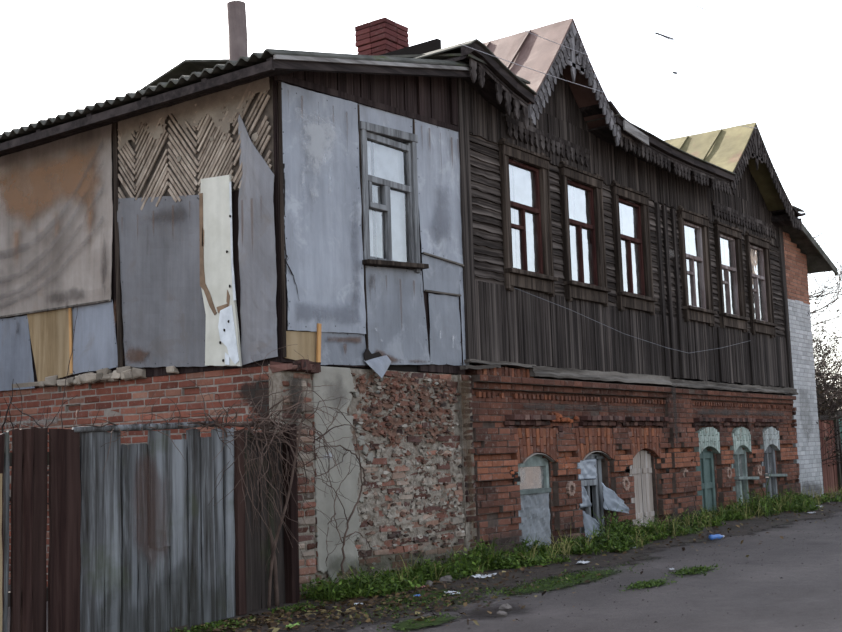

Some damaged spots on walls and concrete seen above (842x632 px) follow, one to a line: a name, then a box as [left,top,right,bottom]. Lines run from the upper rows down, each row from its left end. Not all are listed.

damp [0,149,97,223]
flaking render [312,366,465,583]